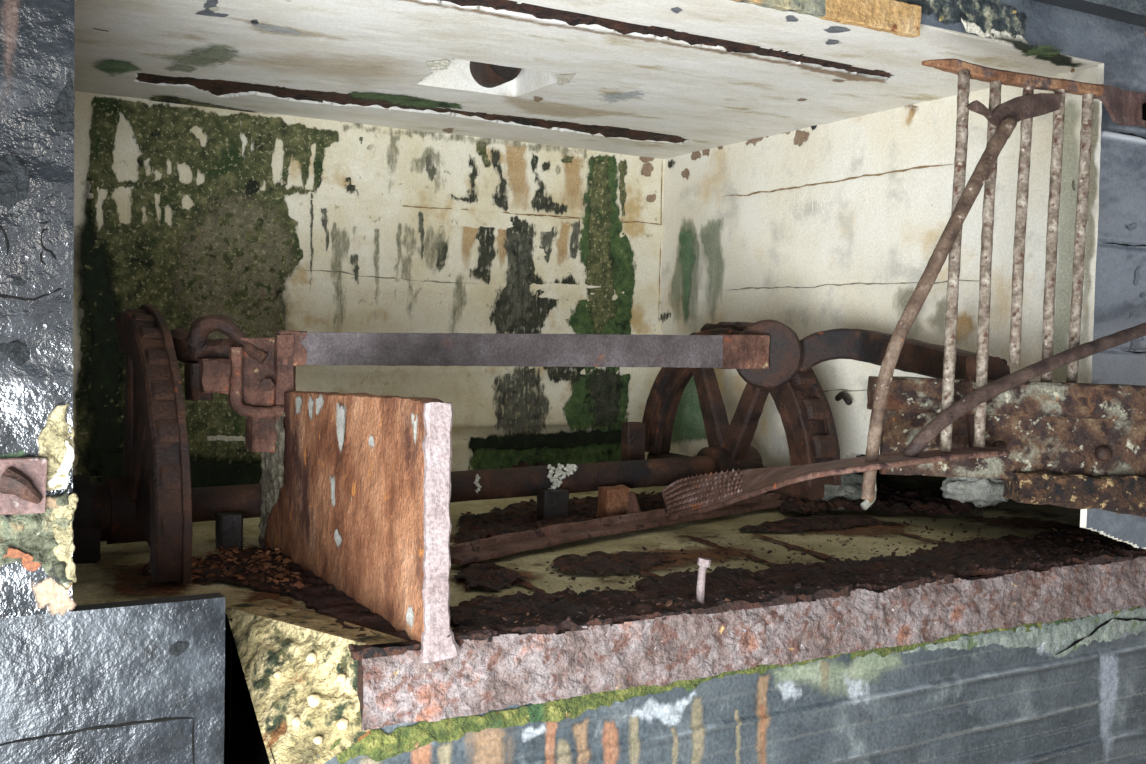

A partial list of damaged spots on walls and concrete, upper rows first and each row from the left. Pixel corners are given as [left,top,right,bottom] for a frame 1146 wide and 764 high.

peeling [824,27,851,45]
peeling [897,0,1028,44]
damp [479,138,586,201]
crack [723,164,953,197]
damp [453,216,580,334]
damp [493,366,586,436]
spalling [0,404,78,615]
corrosion [447,485,1136,637]
crack [1055,618,1146,655]
crack [0,717,195,764]
corrosion [473,728,503,764]
corrosion [545,720,590,764]